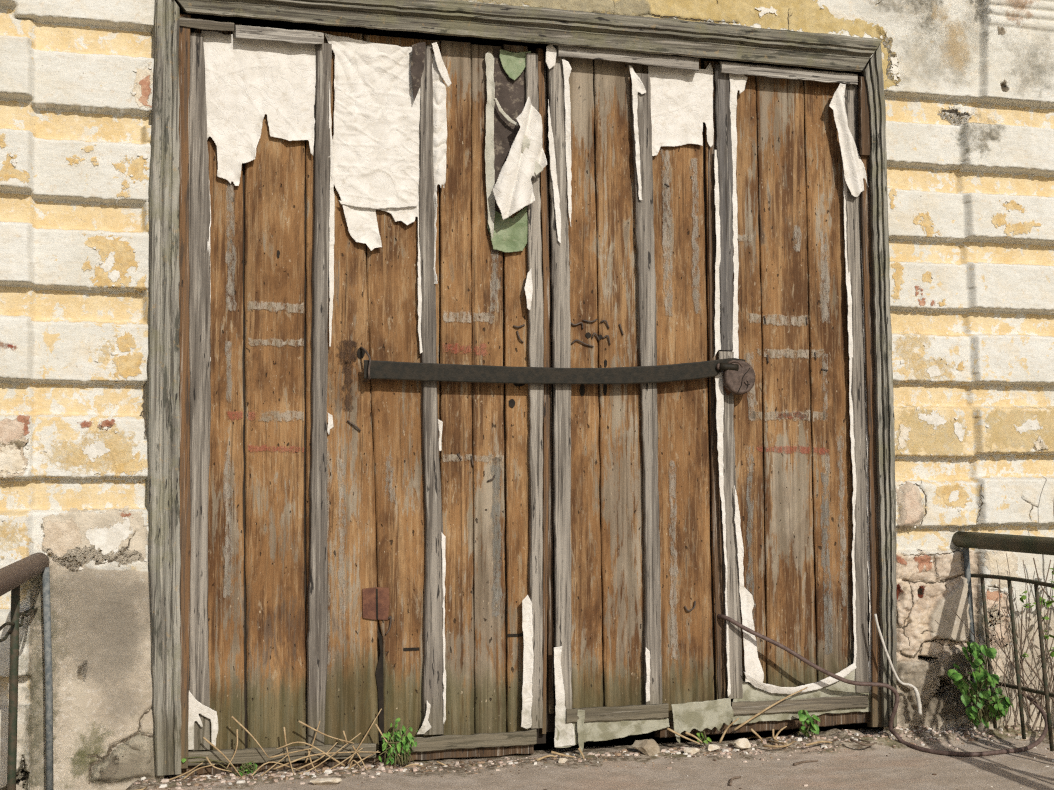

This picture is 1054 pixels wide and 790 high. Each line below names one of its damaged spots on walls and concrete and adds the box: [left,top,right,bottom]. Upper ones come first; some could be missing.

peeling [458,0,901,90]
peeling [991,200,1045,238]
peeling [0,413,143,481]
peeling [936,482,972,511]
spalling [0,506,149,572]
spalling [896,554,933,573]
crack [88,708,153,784]